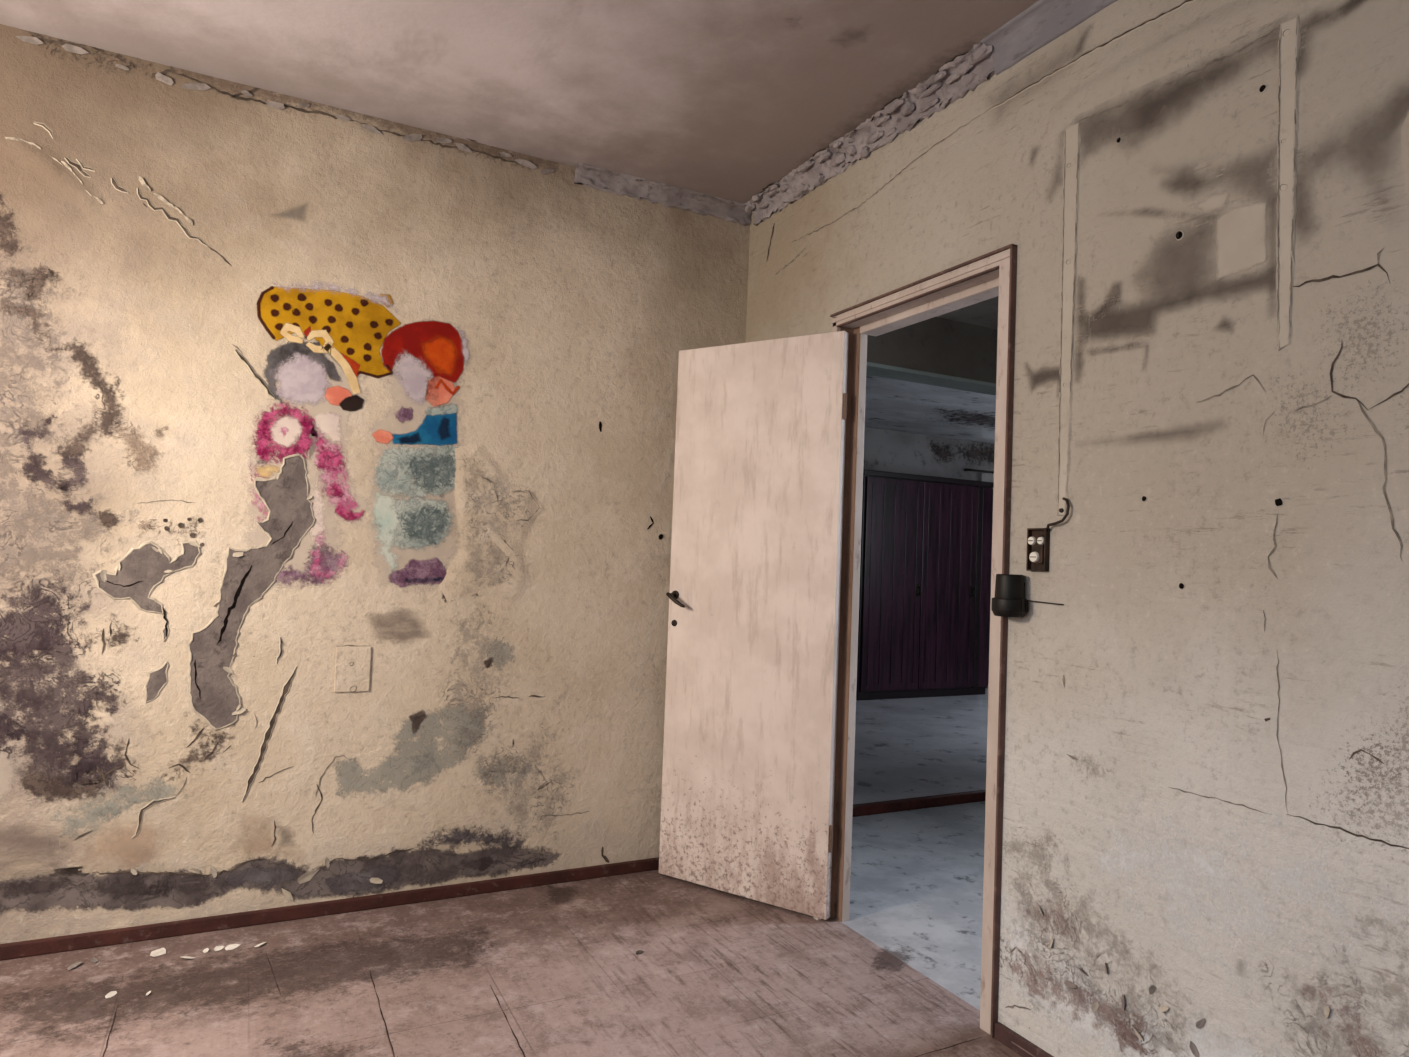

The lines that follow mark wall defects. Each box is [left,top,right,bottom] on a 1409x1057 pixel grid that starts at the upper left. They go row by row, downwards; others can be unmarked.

crack [5,122,231,265]
crack [1293,248,1390,287]
leakage [0,194,167,566]
crack [1199,342,1409,560]
leakage [0,576,135,803]
peeling [53,454,317,836]
crack [241,637,297,802]
peeling [311,680,589,833]
leakage [421,826,525,850]
leakage [4,928,492,1041]
efflorescence [1003,900,1253,1057]